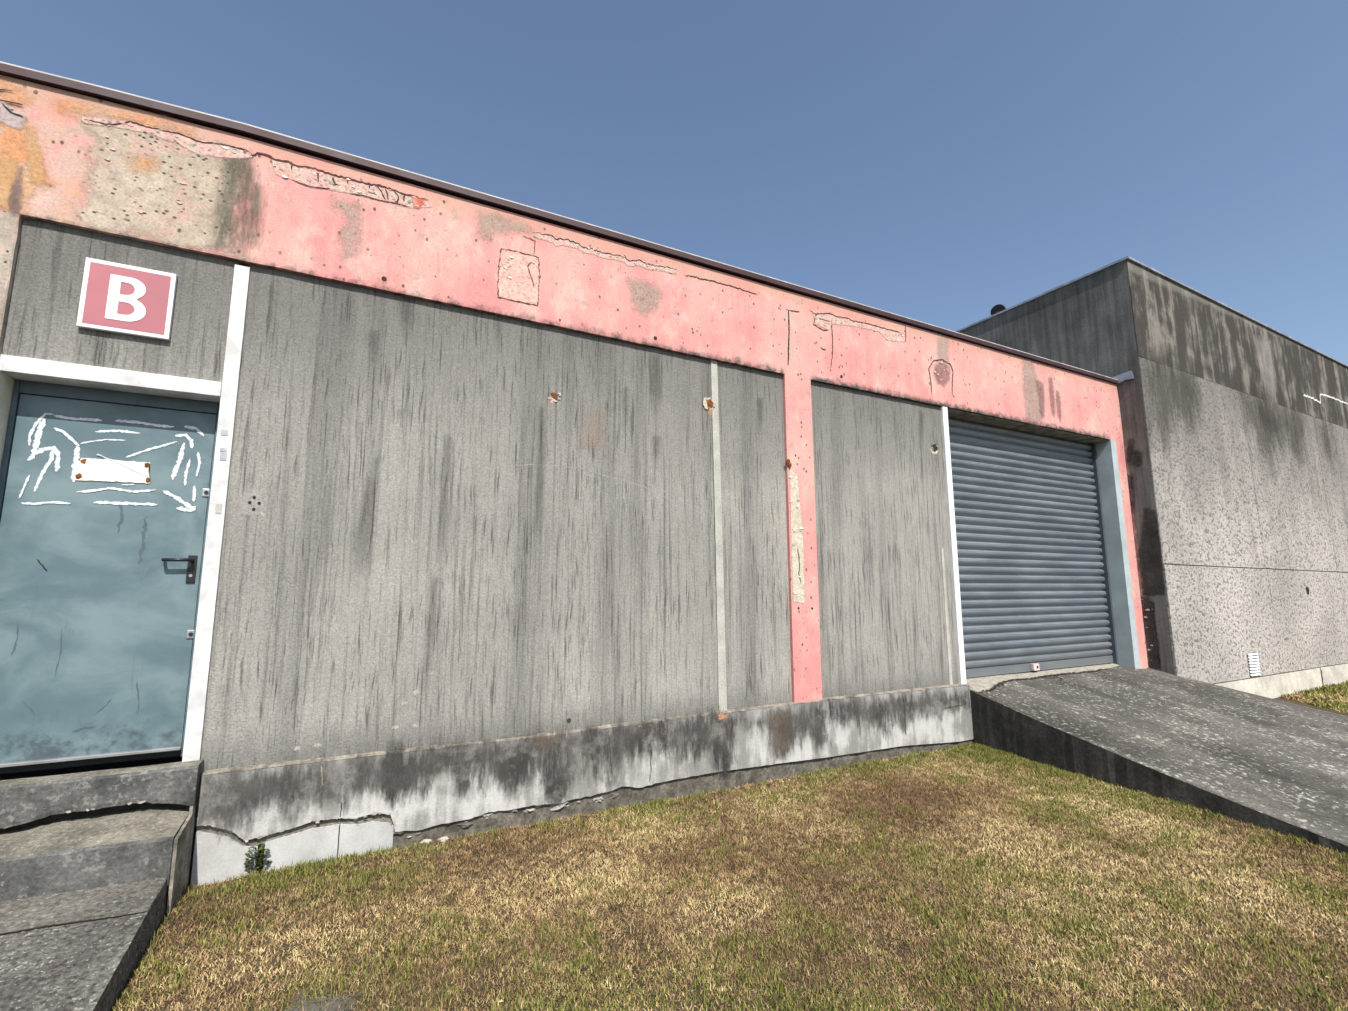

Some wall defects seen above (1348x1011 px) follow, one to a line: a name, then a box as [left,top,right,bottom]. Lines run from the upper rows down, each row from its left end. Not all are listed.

spalling [0,101,26,129]
peeling [77,116,252,256]
peeling [480,214,677,312]
peeling [812,311,905,342]
crack [1304,394,1348,405]
water stain [693,716,734,773]
crack [0,766,393,846]
water stain [455,760,470,796]